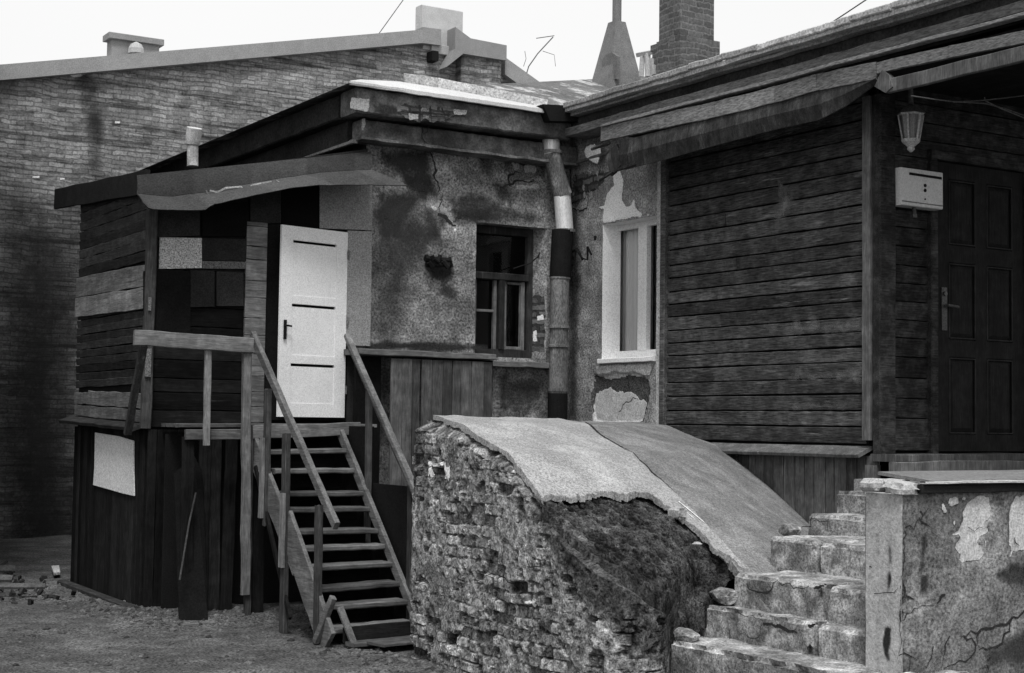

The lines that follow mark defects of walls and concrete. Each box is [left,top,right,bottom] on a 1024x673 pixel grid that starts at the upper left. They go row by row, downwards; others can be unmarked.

crack [421,127,486,226]
damp [378,151,534,328]
peeling [570,167,649,223]
damp [7,207,71,538]
spalling [591,364,652,422]
peeling [942,495,991,563]
peeling [1009,495,1024,557]
crack [874,508,1024,670]